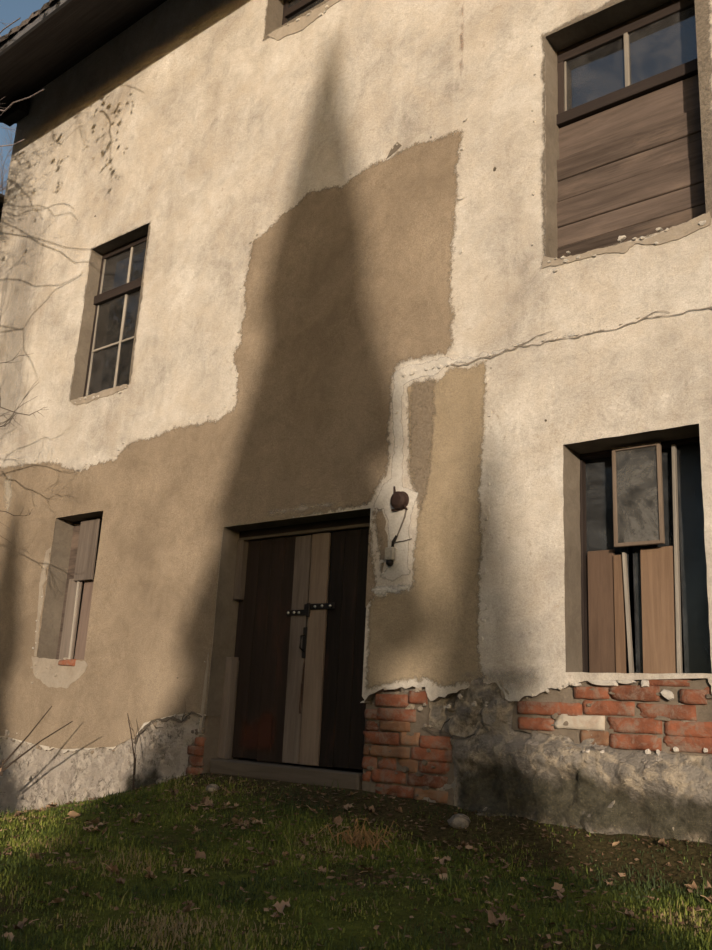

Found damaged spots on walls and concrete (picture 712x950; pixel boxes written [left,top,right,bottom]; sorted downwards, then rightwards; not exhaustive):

crack [451,306,712,366]
peeling [0,118,712,815]
spalling [526,812,649,836]
spalling [672,827,712,845]